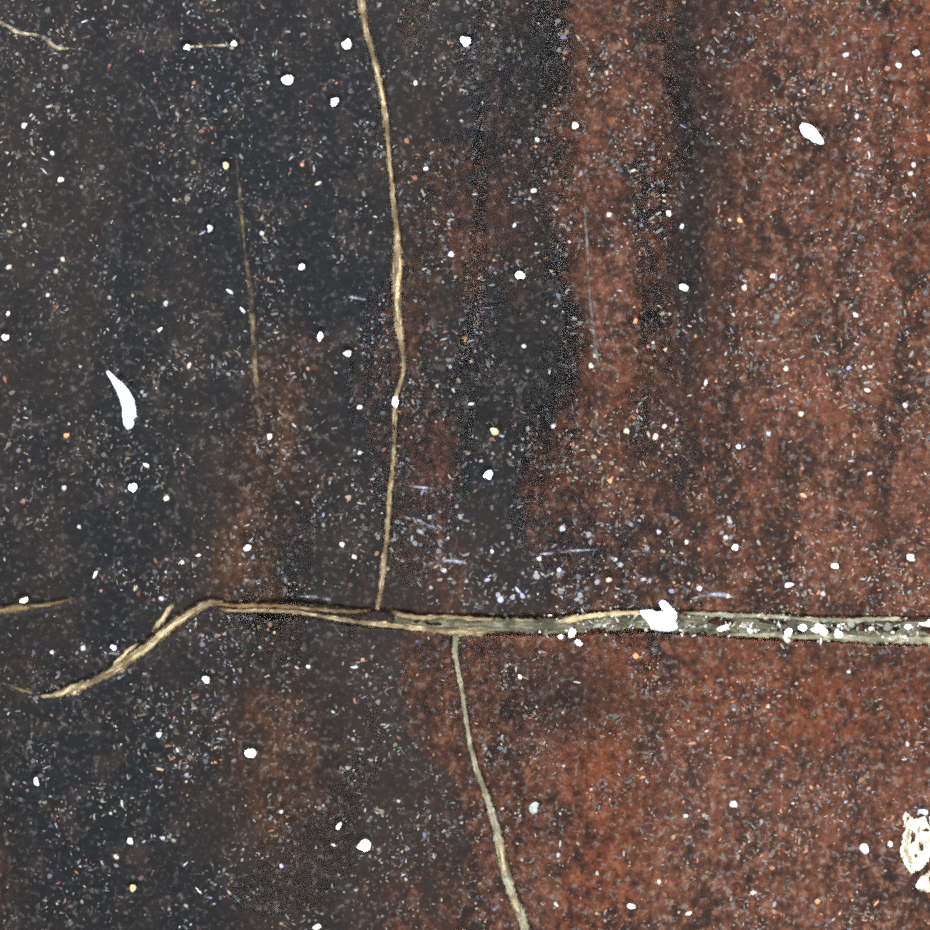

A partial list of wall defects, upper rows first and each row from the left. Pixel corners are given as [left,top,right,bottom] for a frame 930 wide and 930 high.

crack [2,23,68,50]
crack [15,0,651,930]
crack [0,598,75,615]
crack [671,611,930,646]